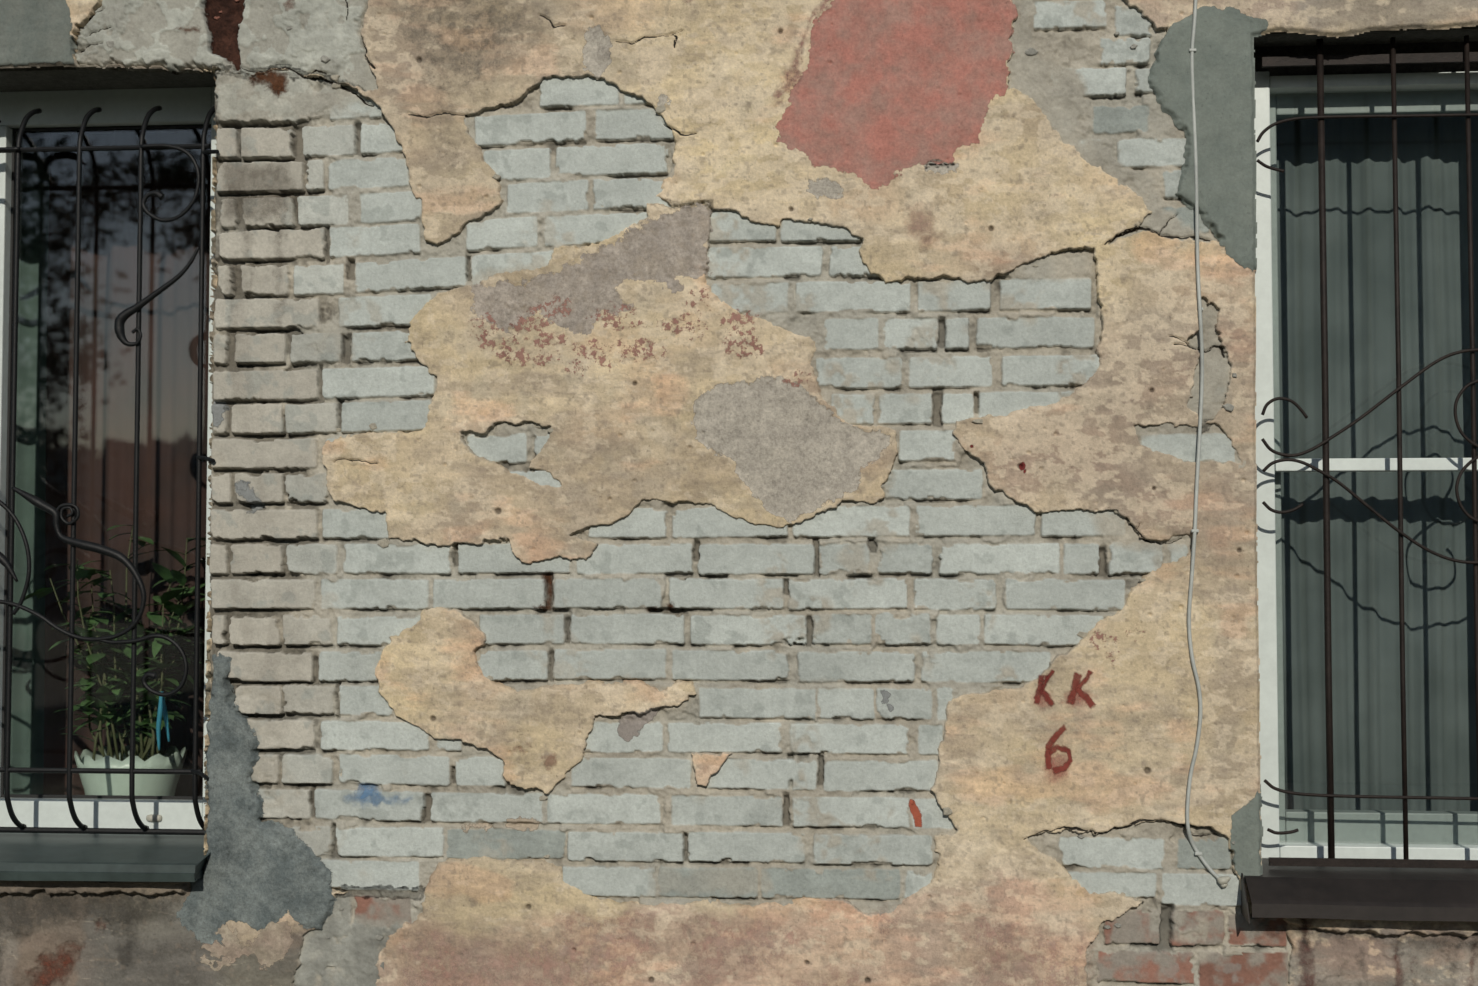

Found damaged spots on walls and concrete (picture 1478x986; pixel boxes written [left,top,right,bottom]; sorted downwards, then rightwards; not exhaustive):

crack [77,10,111,53]
crack [242,0,376,107]
spalling [1134,298,1246,469]
spalling [75,0,1218,986]
spalling [976,821,1292,986]